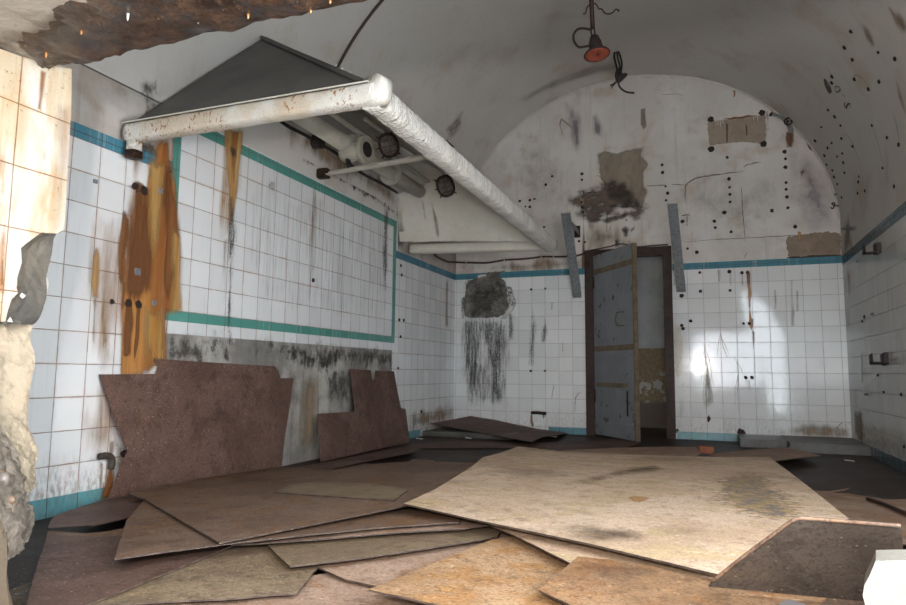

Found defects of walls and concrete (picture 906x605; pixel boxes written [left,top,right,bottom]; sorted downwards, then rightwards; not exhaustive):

peeling [707,110,767,152]
leakage [170,197,237,362]
leakage [569,148,648,246]
peeling [786,231,842,258]
spalling [0,231,62,560]
leakage [269,341,391,401]
corrosion [26,130,906,605]